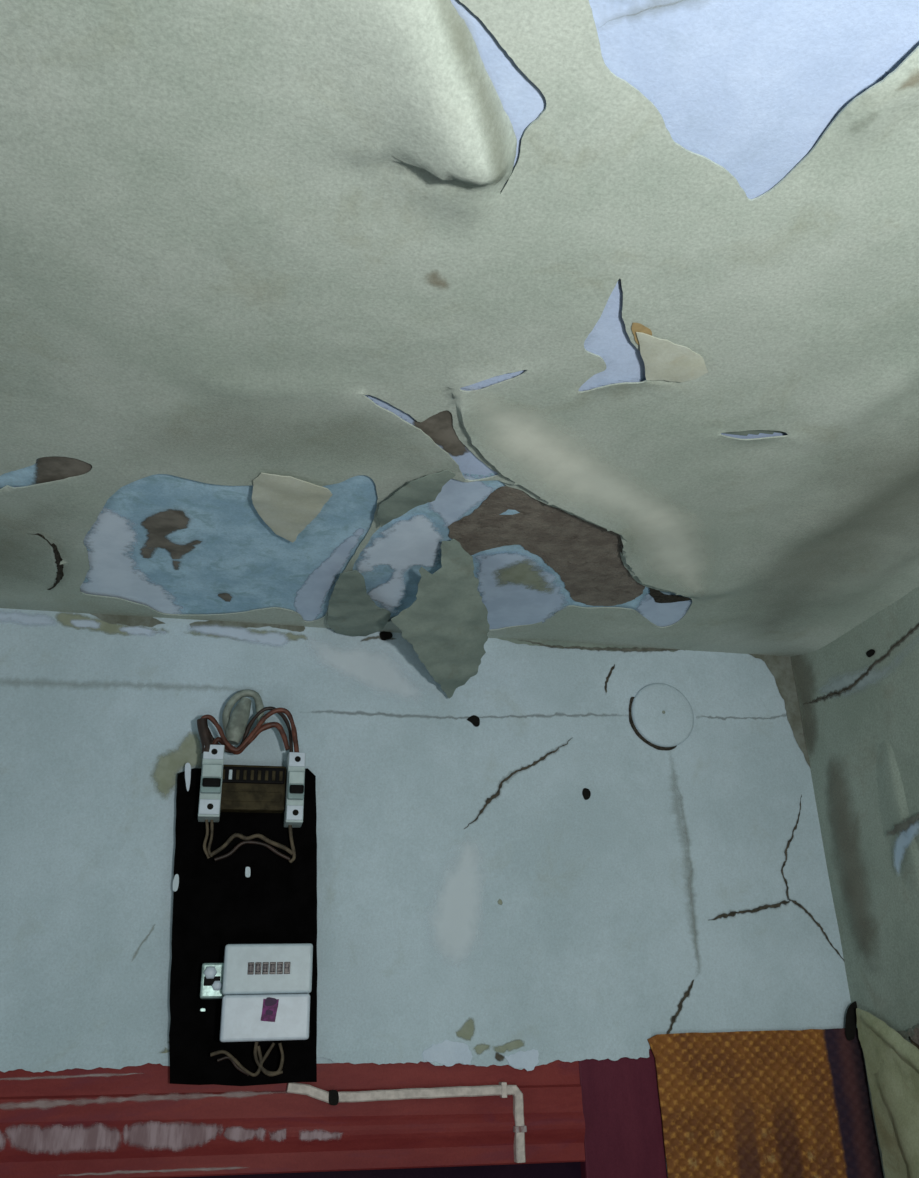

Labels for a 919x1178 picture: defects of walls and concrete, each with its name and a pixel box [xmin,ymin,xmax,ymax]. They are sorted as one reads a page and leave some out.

peeling [0,612,166,636]
peeling [190,621,307,646]
spalling [362,631,395,641]
crack [809,623,919,703]
crack [464,738,572,829]
crack [712,795,845,962]